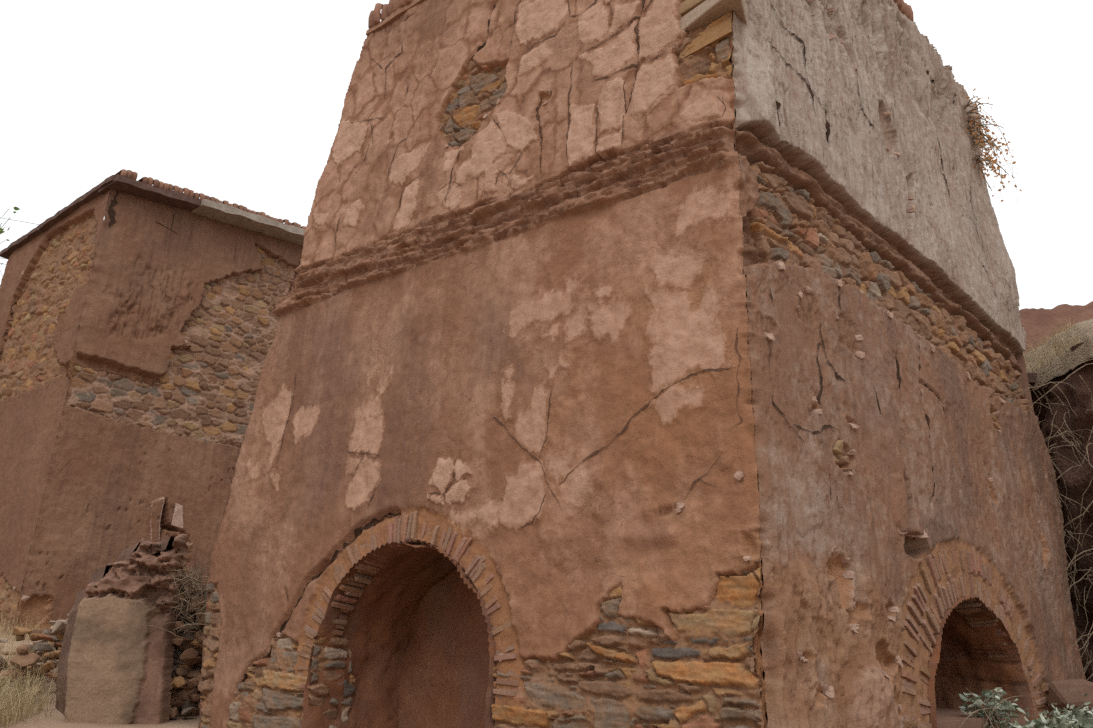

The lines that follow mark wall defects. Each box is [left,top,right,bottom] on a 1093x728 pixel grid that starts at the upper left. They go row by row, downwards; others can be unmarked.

crack [108,191,118,228]
crack [348,47,462,222]
crack [471,0,596,61]
crack [490,0,667,186]
spalling [0,213,323,496]
crack [482,328,743,528]
spalling [424,161,1033,539]
crack [873,345,944,437]
spalling [491,524,765,728]